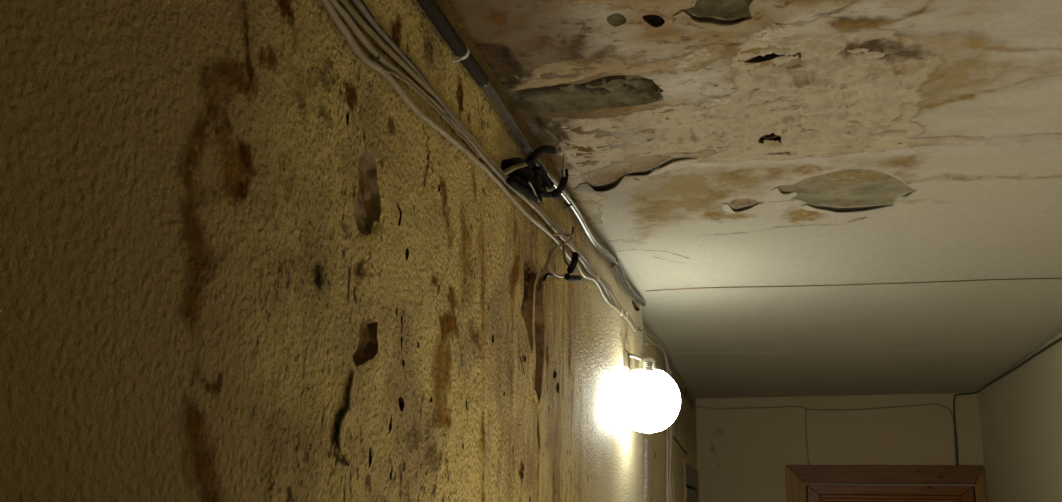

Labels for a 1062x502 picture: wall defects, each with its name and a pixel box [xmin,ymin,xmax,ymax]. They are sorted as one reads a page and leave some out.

damp [847,43,924,60]
spalling [499,0,984,224]
damp [184,20,255,316]
spalling [354,151,382,237]
damp [629,171,760,220]
damp [791,210,819,222]
spalling [521,260,559,408]
peeling [333,319,378,466]
damp [188,406,220,502]